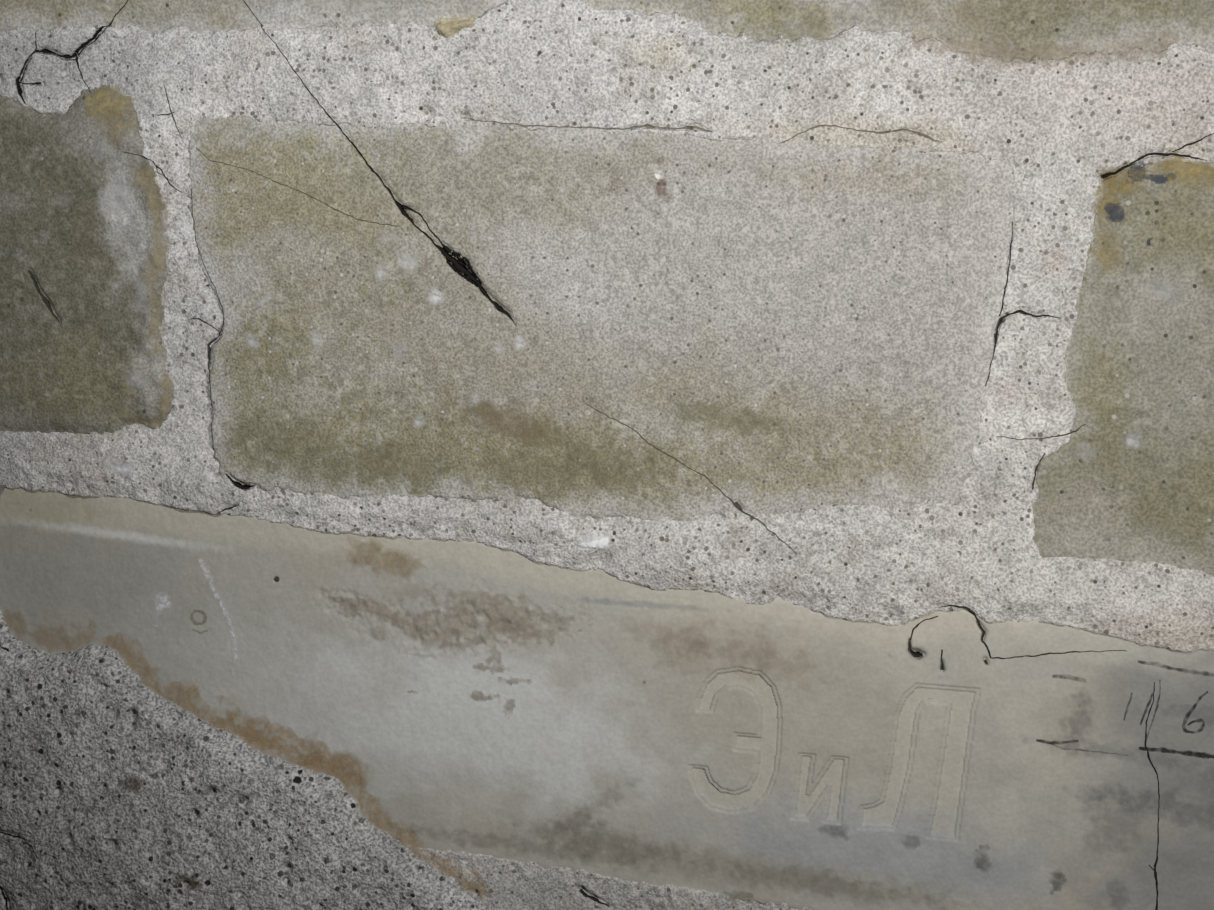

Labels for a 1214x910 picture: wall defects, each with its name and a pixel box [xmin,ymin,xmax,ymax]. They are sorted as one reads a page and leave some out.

crack [16,0,128,103]
crack [157,0,516,325]
crack [468,118,712,132]
crack [779,125,939,144]
crack [587,404,797,554]
crack [909,605,1126,670]